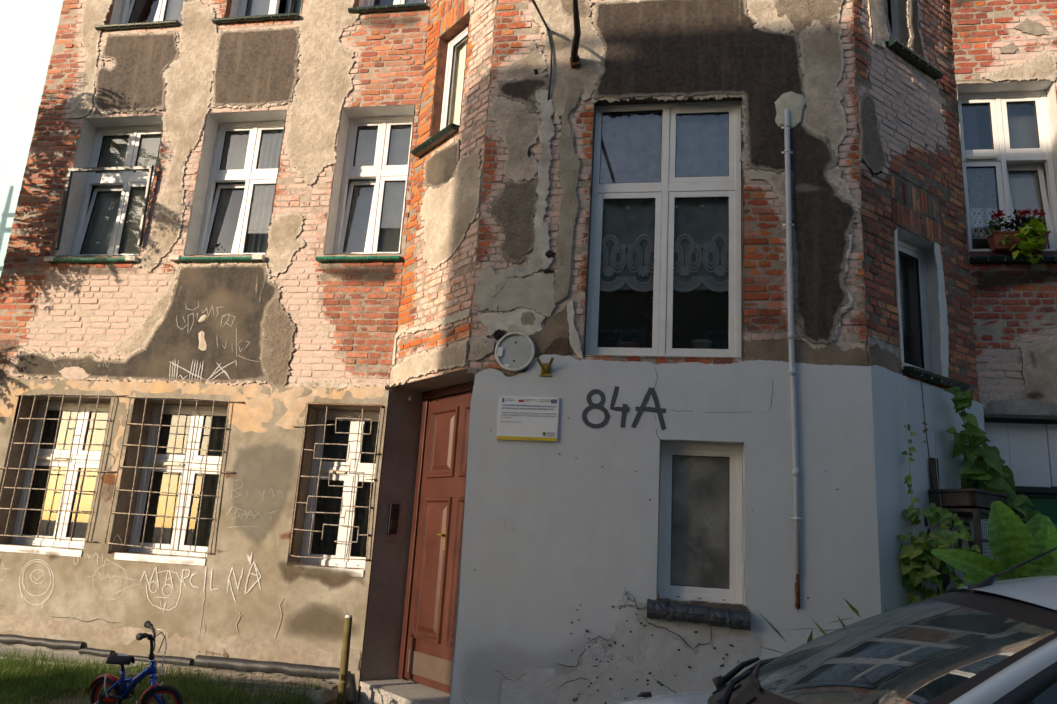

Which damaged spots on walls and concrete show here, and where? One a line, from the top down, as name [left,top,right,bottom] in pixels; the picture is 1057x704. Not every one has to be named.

peeling [198,315,207,351]
peeling [59,366,90,380]
peeling [497,590,764,704]